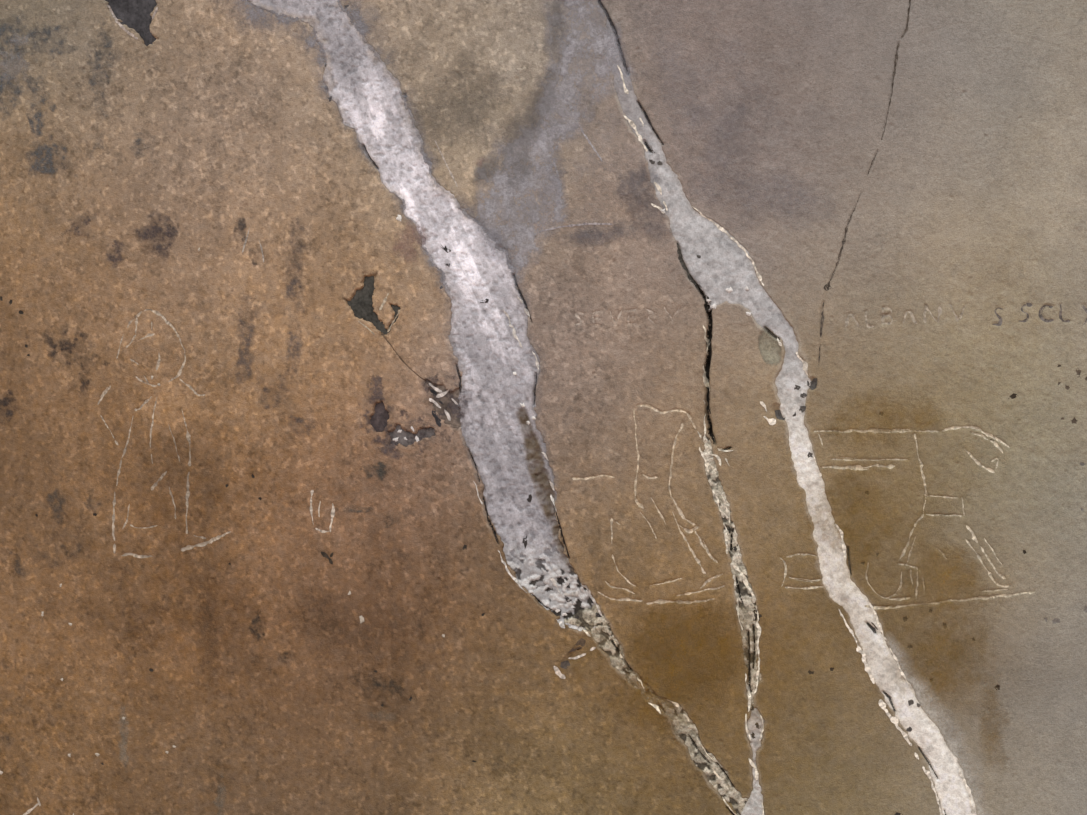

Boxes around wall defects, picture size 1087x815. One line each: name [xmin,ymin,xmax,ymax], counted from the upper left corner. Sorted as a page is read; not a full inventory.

flaking render [105,0,158,46]
water stain [240,0,325,66]
water stain [337,0,369,37]
water stain [459,0,631,280]
flaking render [346,276,401,335]
crack [248,0,977,815]